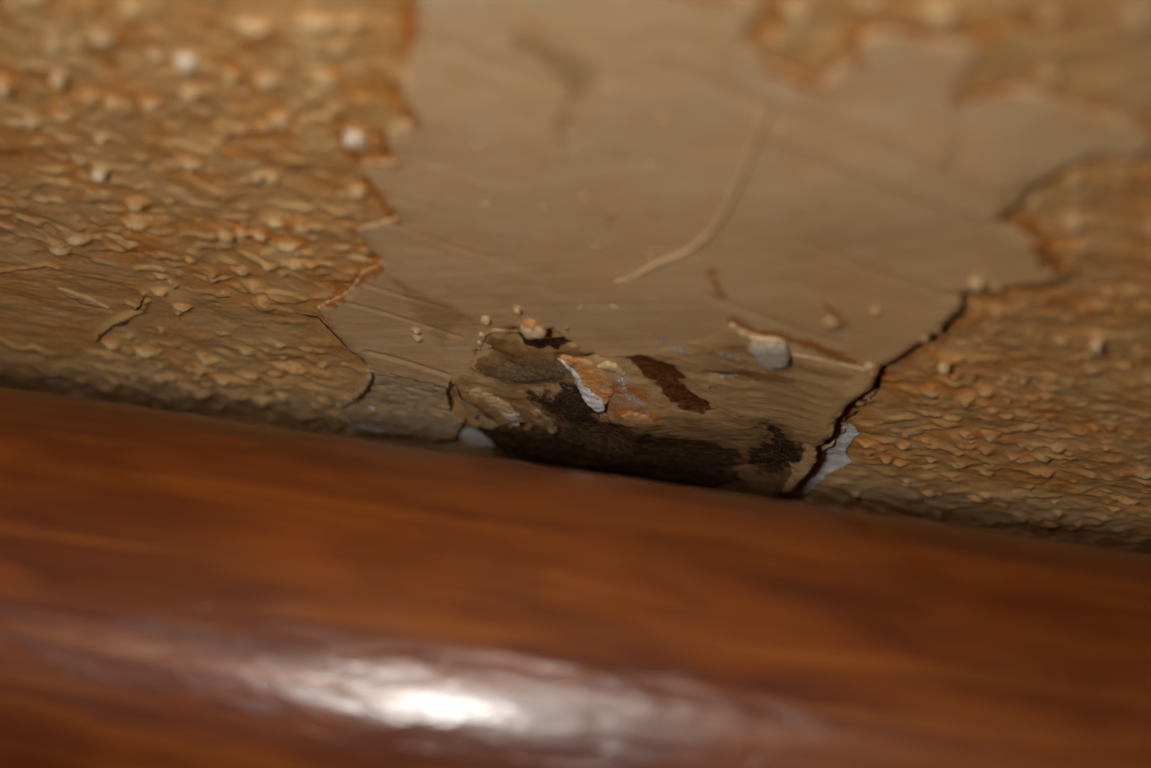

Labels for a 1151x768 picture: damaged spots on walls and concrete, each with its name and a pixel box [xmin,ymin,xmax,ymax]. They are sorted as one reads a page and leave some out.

leakage [469,337,829,490]
peeling [317,0,1151,500]